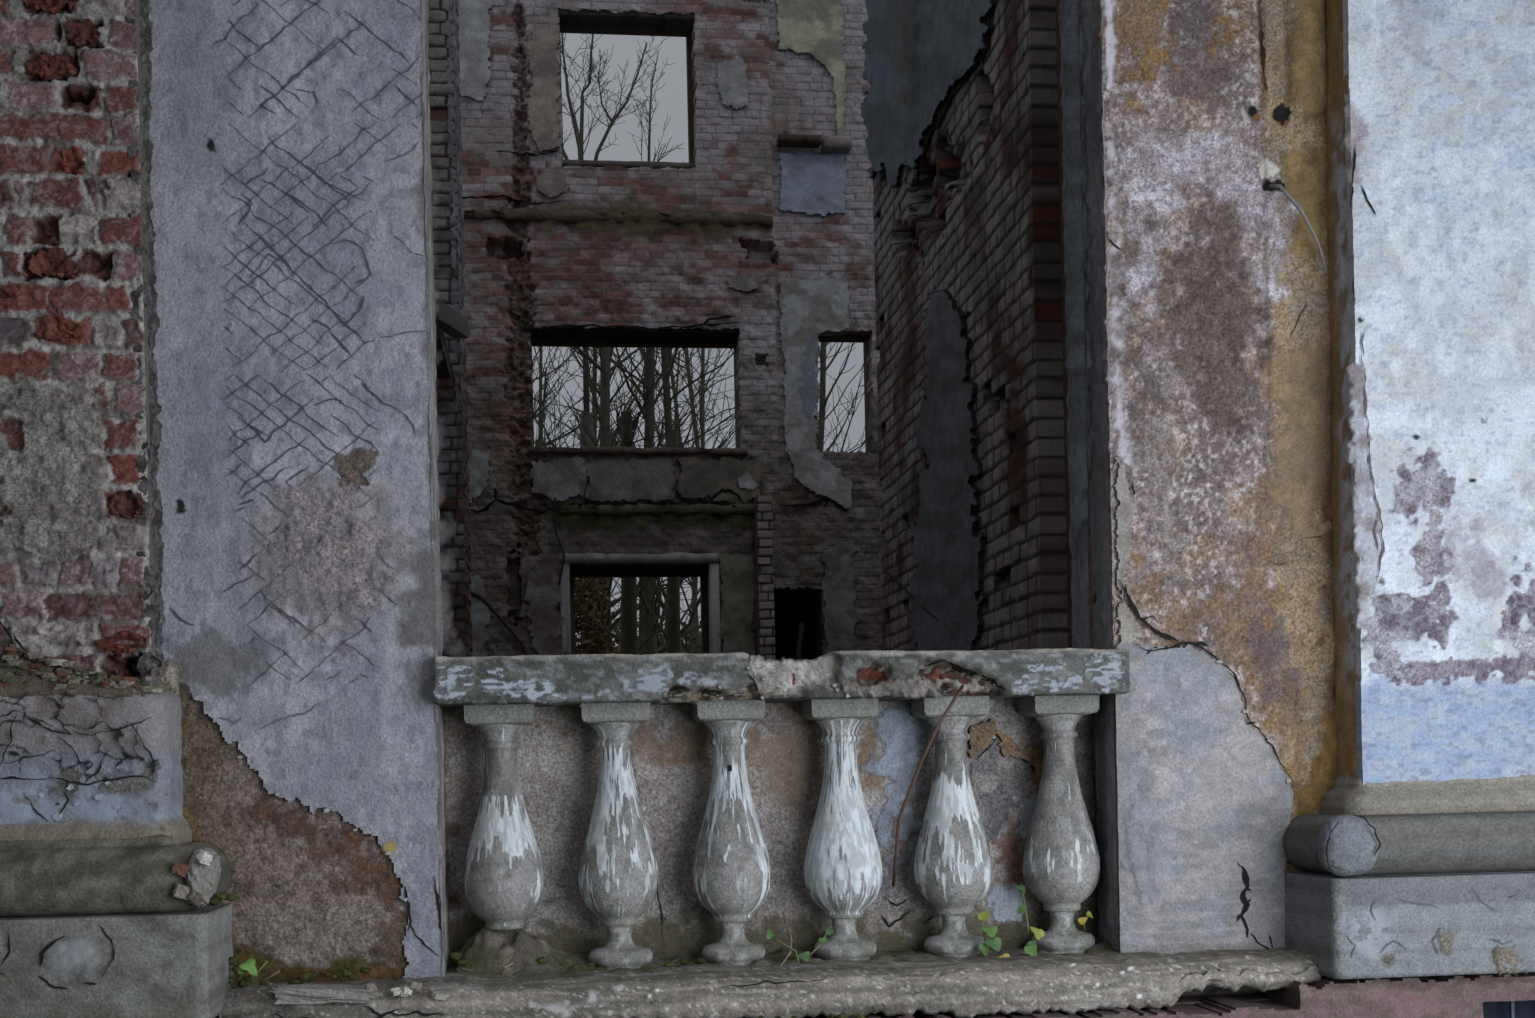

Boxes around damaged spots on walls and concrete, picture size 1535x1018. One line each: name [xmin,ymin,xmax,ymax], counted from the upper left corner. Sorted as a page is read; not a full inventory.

flaking render [458,0,493,102]
flaking render [776,0,997,217]
spalling [33,312,83,342]
crack [213,0,424,729]
flaking render [779,276,852,509]
flaking render [1061,0,1093,553]
spalling [105,489,145,519]
crack [0,621,29,655]
crack [0,691,159,821]
flaking render [172,683,449,1008]
flaking render [435,449,1293,954]
crack [1238,863,1273,949]